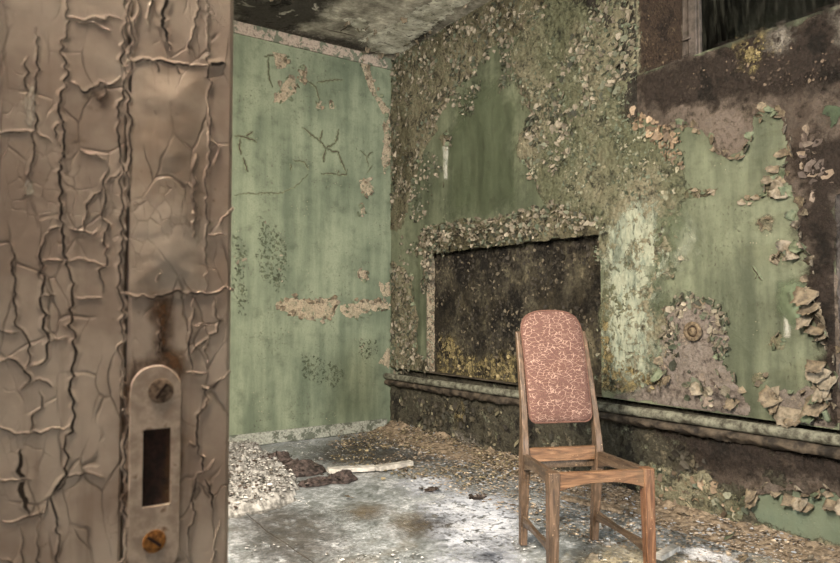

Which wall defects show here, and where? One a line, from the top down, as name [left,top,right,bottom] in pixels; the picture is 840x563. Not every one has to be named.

leakage [234,0,376,54]
mould [573,0,840,122]
rust [124,300,185,403]
crack [0,0,373,563]
peeling [231,217,287,315]
peeling [273,0,840,428]
leakage [396,139,840,434]
peeling [390,386,840,547]